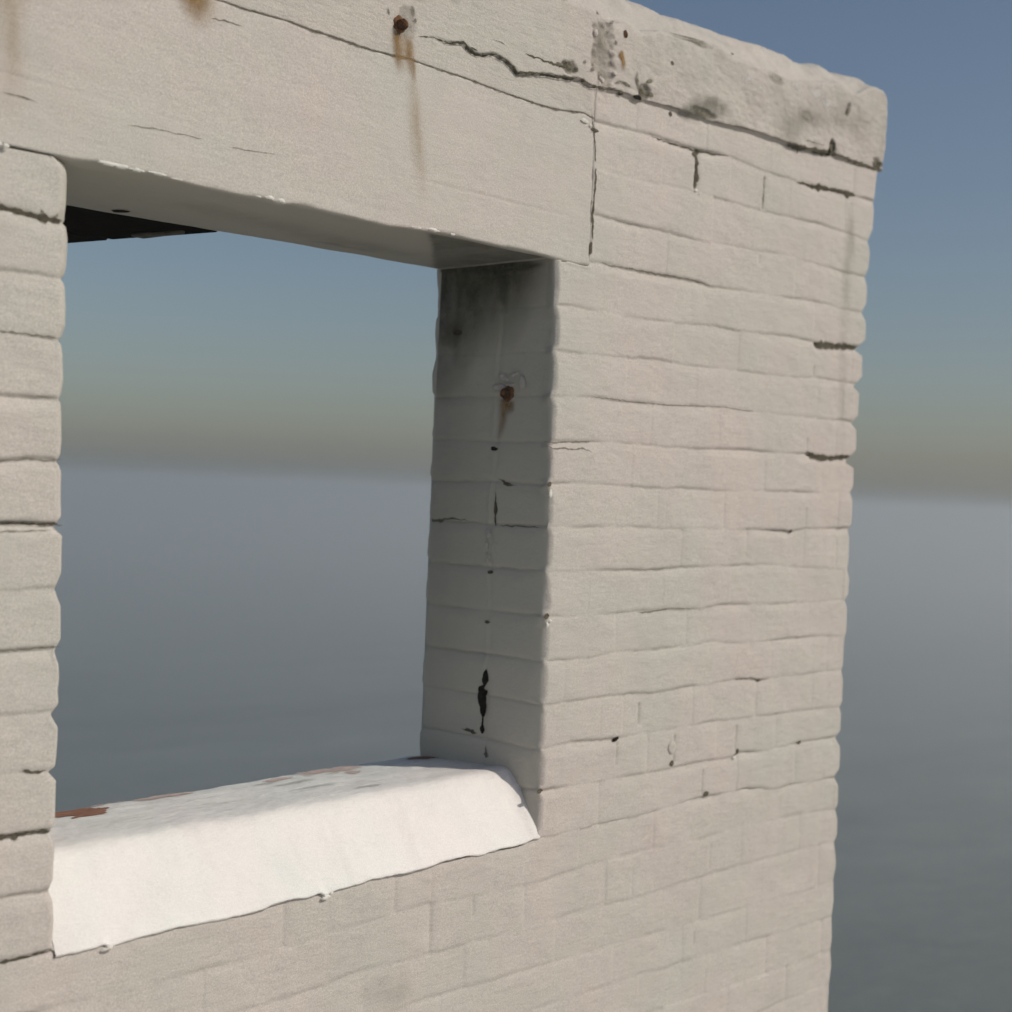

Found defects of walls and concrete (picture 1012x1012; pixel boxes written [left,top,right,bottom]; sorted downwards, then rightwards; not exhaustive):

rust [395,32,414,66]
spalling [557,12,653,97]
crack [214,4,710,286]
crack [653,137,730,188]
crack [788,140,882,171]
crack [797,181,856,198]
damp [438,243,536,346]
crack [814,340,856,350]
crack [807,451,849,461]
crack [463,669,489,757]
flaking render [55,801,120,818]